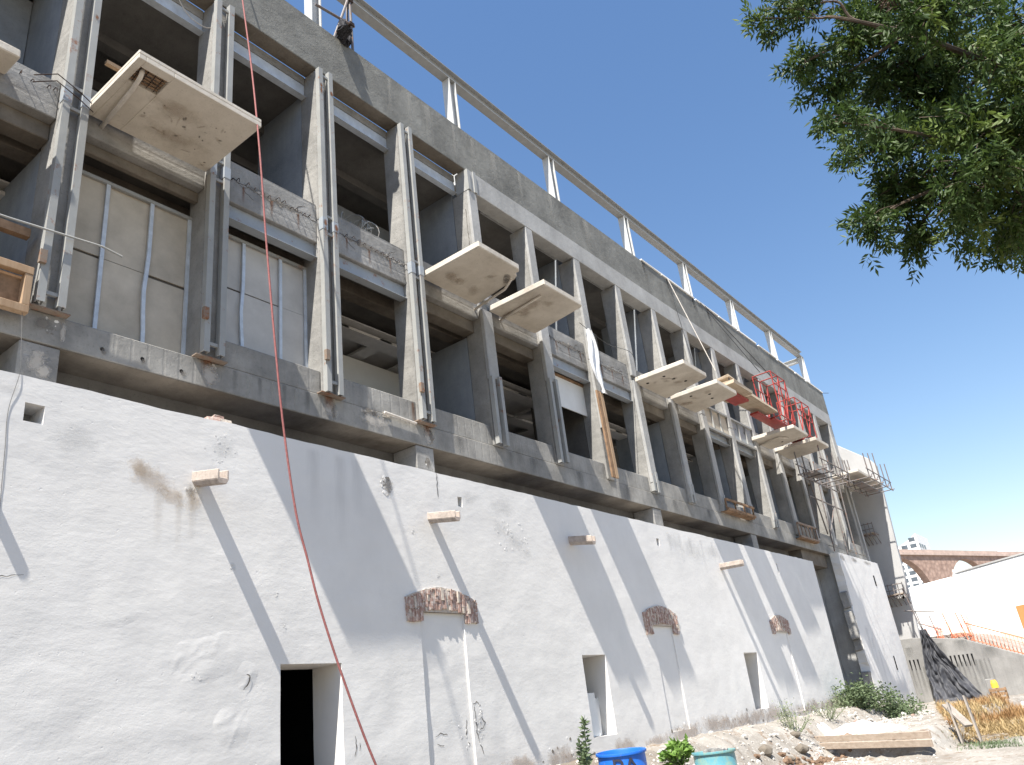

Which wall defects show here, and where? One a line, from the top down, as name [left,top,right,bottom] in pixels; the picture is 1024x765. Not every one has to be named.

flaking render [381,476,392,496]